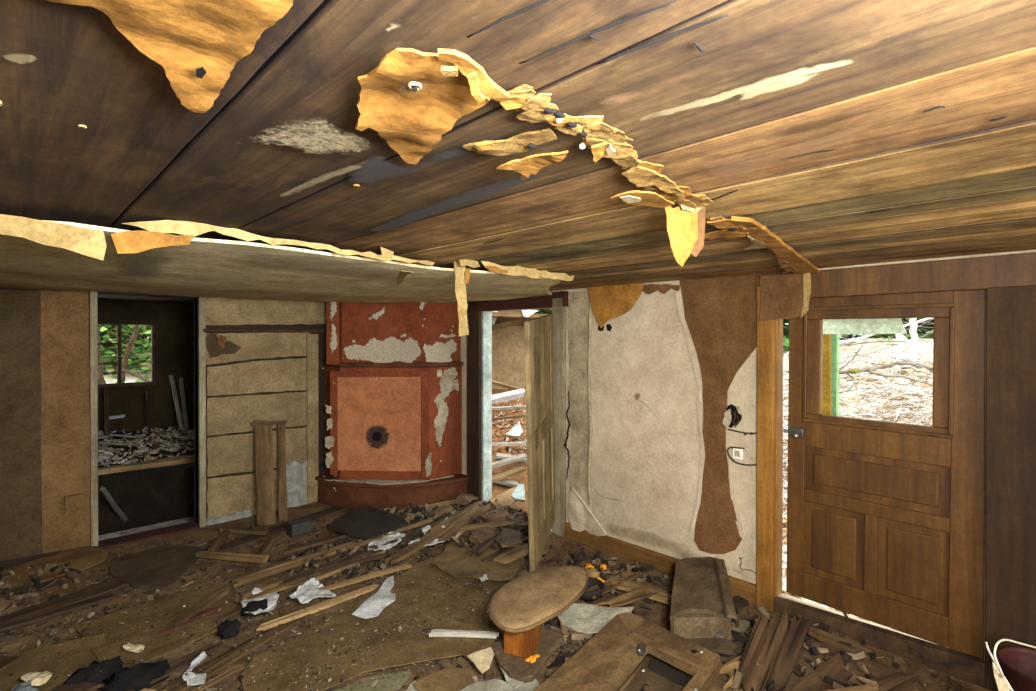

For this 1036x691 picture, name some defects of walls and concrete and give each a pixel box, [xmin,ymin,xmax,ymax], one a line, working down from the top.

peeling [324,404,336,491]
peeling [330,302,459,477]
crack [563,392,621,501]
hole [723,404,742,428]